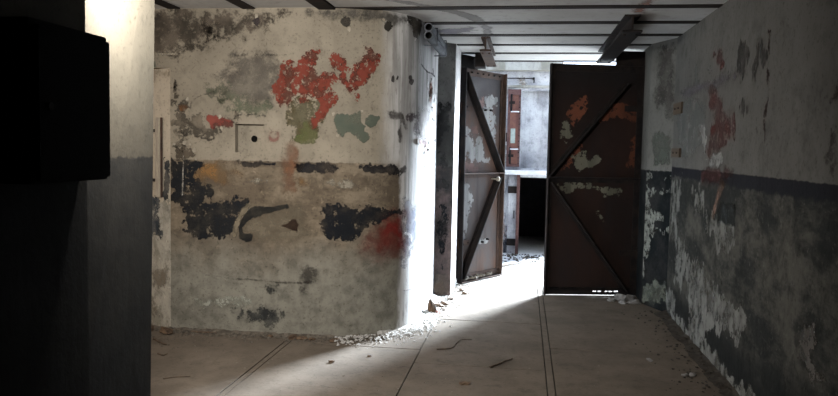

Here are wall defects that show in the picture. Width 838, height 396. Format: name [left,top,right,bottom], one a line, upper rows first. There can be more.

peeling [332,110,380,143]
peeling [152,80,249,240]
peeling [237,160,276,168]
peeling [294,161,338,174]
peeling [359,162,406,177]
peeling [319,202,402,242]
peeling [643,171,755,396]